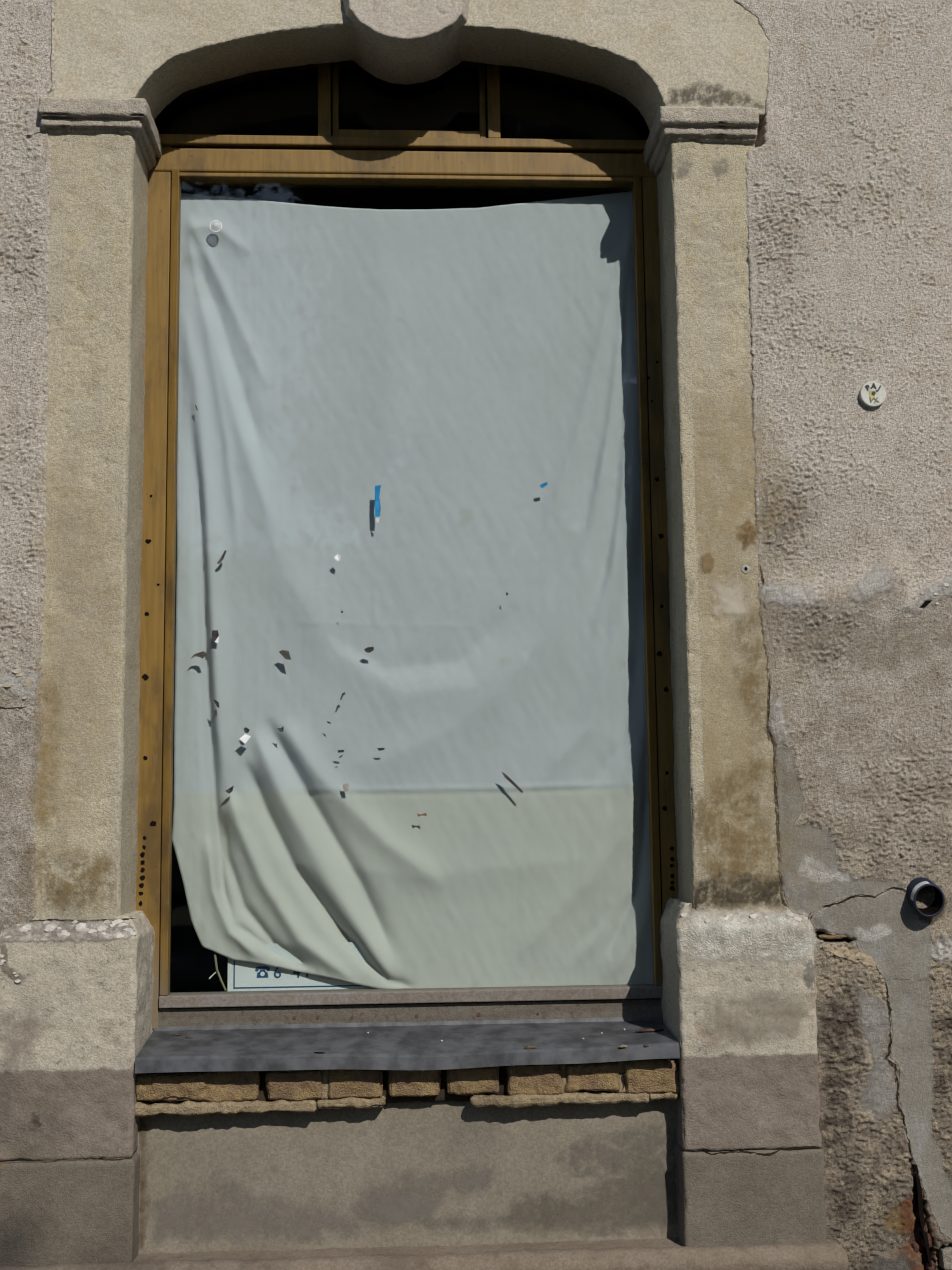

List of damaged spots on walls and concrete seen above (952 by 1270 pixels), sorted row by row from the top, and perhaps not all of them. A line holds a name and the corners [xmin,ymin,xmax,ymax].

crack [46,0,54,94]
damp [702,553,713,572]
damp [690,734,782,908]
crack [808,887,907,920]
crack [872,979,913,1158]
spalling [908,1164,952,1270]